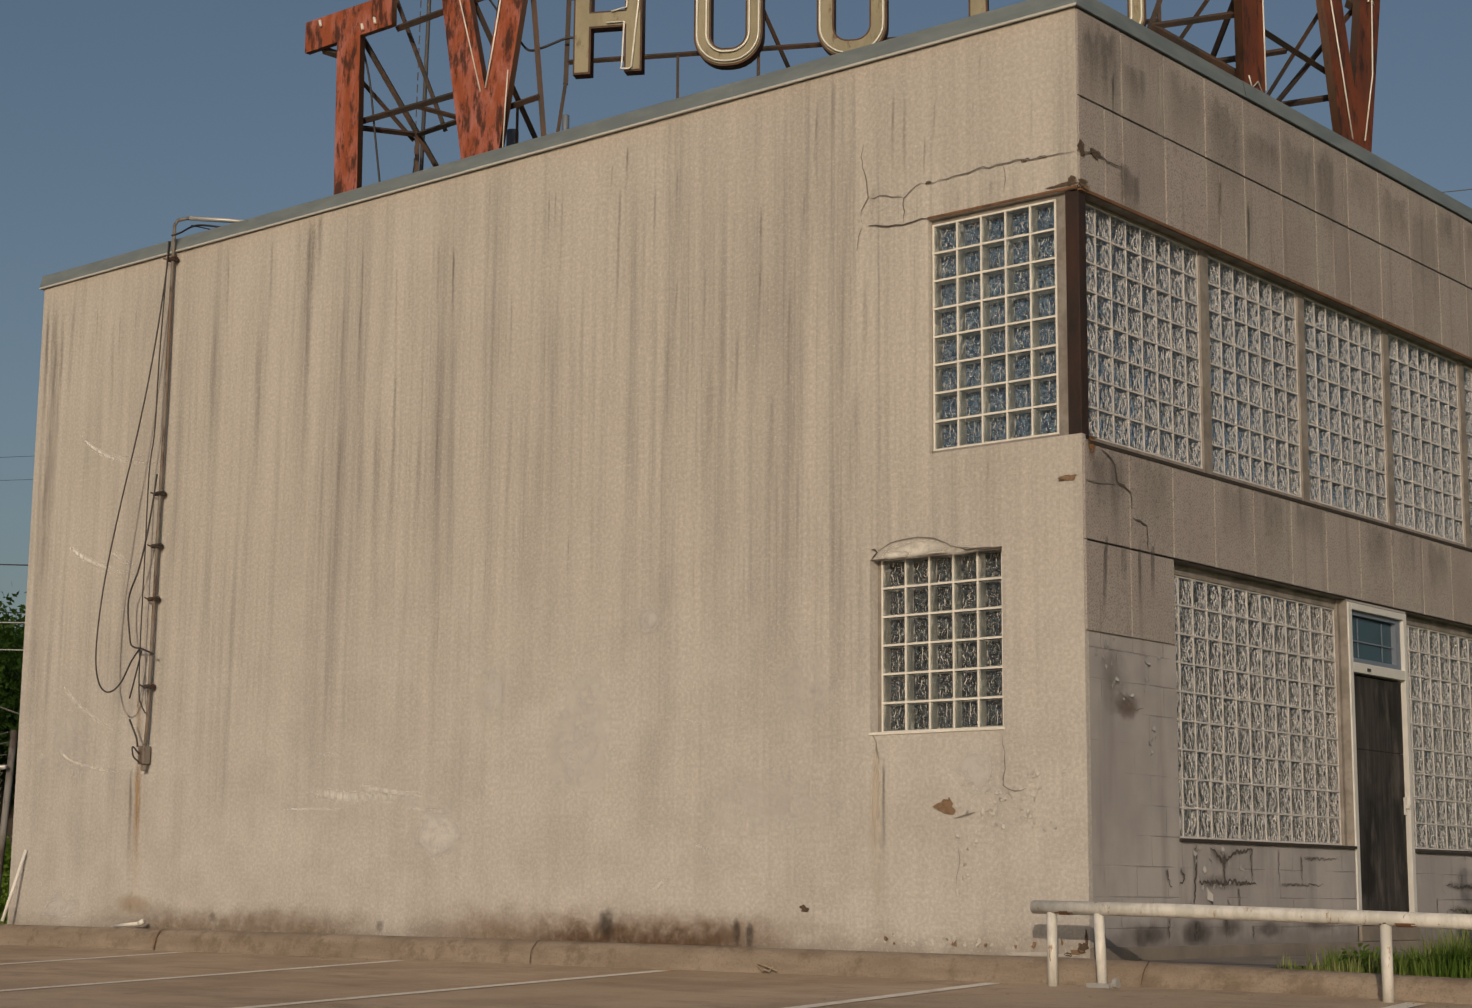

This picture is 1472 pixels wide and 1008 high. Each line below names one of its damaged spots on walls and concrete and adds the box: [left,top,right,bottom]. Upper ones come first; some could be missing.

crack [857,144,1073,248]
crack [1086,450,1149,550]
spalling [933,797,956,815]